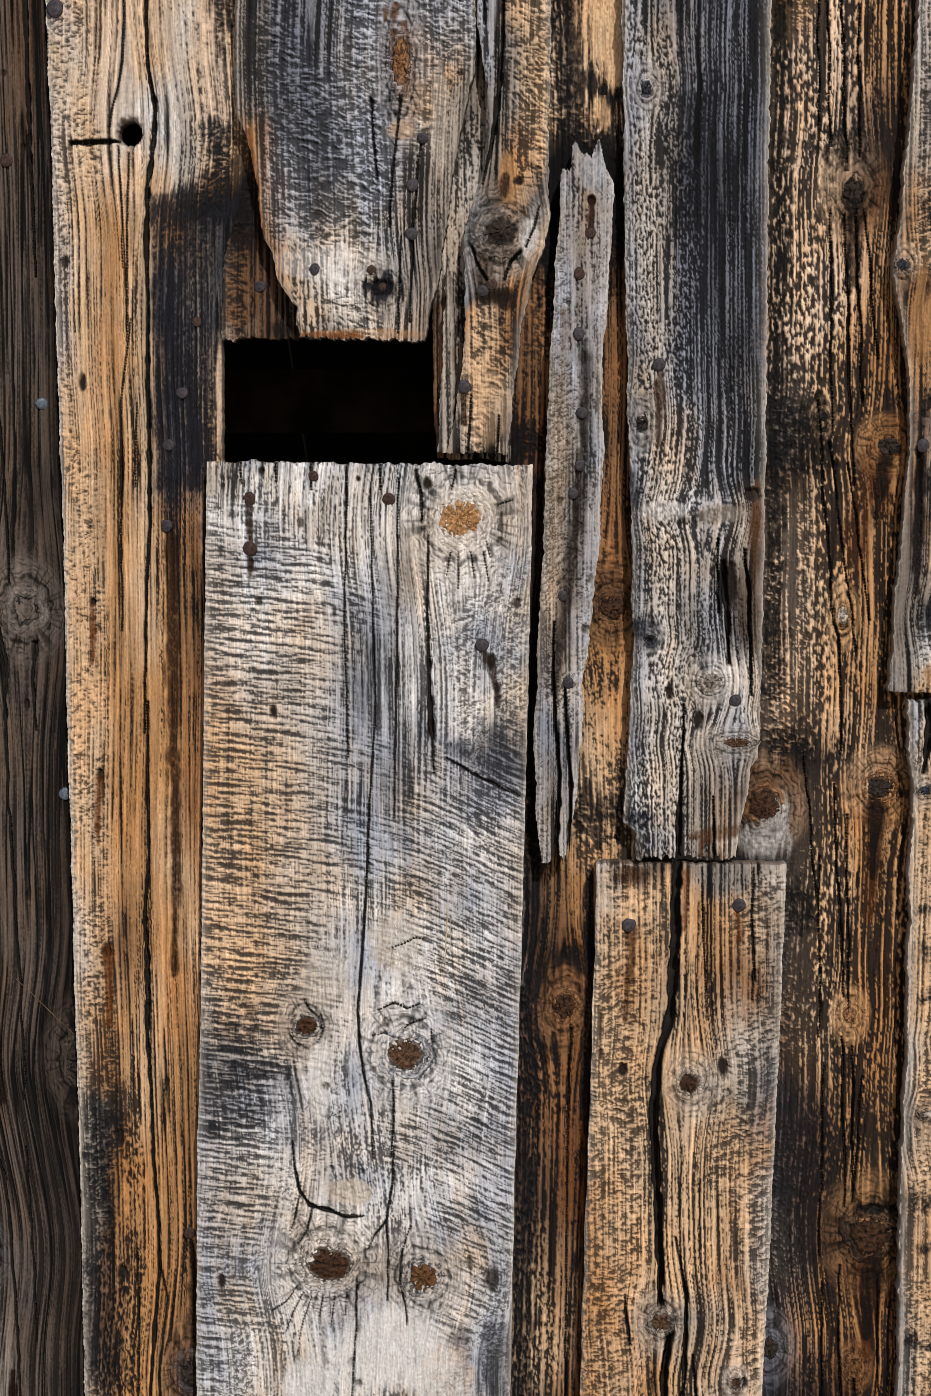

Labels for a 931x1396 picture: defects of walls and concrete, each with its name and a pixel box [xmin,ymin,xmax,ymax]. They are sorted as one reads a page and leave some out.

crack [23,0,36,276]
crack [0,424,9,581]
crack [0,643,37,1099]
crack [71,0,175,1396]
crack [271,398,519,1390]
crack [552,636,573,866]
crack [563,1047,571,1367]
crack [625,705,715,1396]
crack [749,868,757,996]